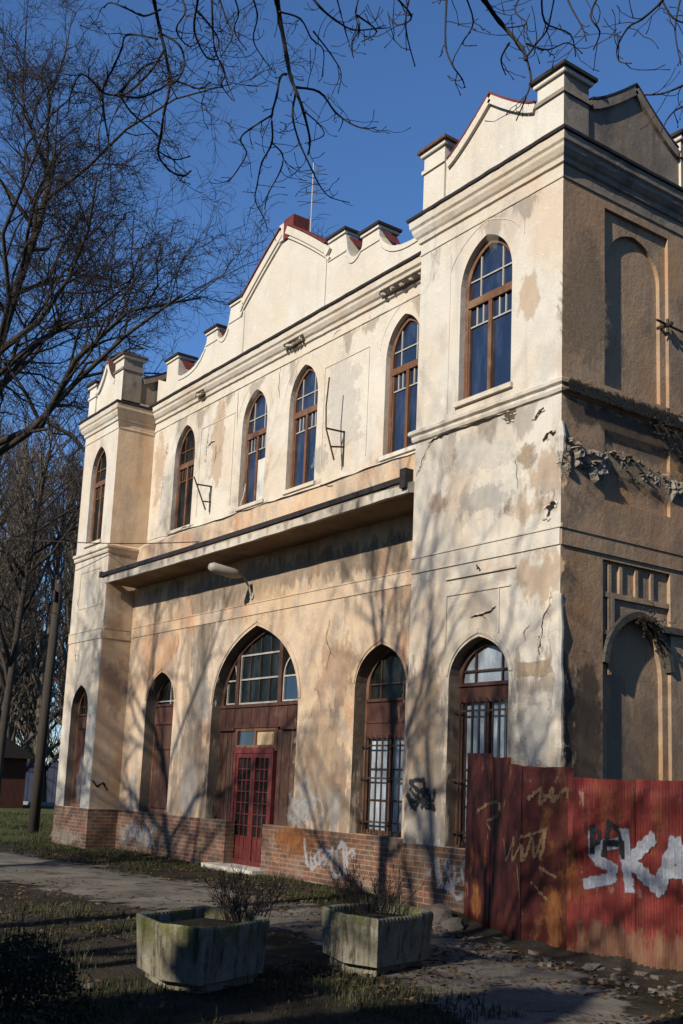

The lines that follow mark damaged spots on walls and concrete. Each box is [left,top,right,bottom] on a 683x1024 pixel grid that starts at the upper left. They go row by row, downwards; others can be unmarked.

spalling [502,409,517,424]
spalling [557,436,683,506]
spalling [542,498,559,522]
crack [470,606,496,620]
crack [523,590,553,656]
rust [471,880,481,919]
rust [543,889,683,971]